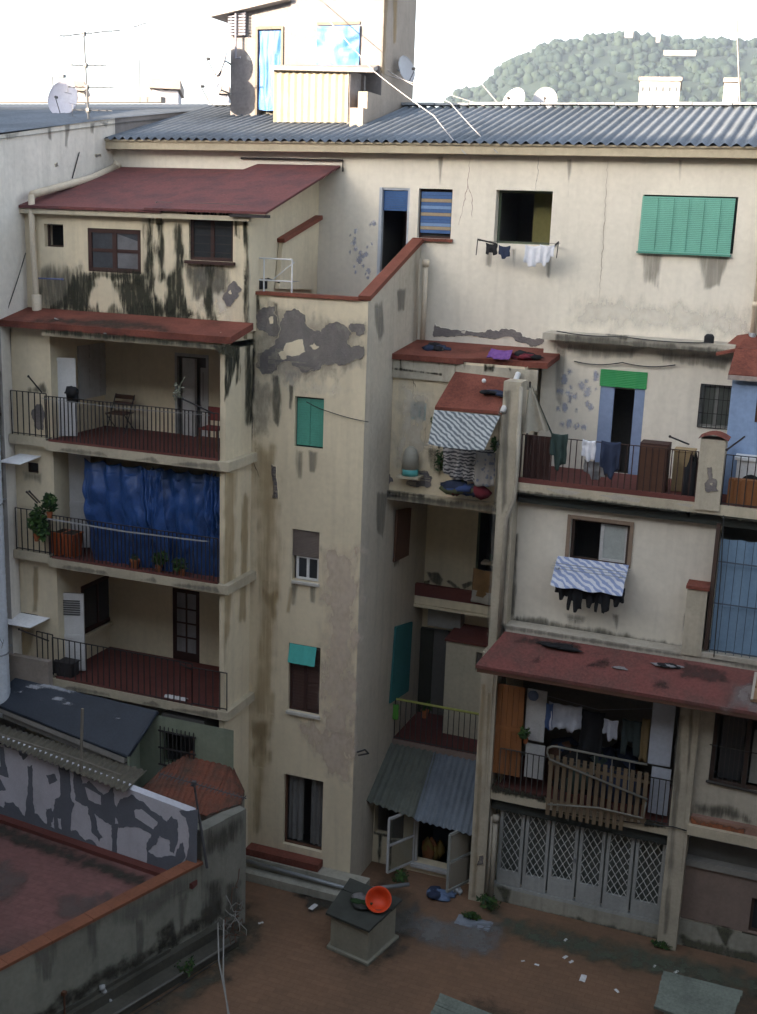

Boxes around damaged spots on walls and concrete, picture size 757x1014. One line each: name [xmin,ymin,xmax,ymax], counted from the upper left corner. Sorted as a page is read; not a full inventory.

peeling [222,281,242,307]
leakage [35,212,259,433]
peeling [256,306,366,375]
peeling [433,324,544,347]
leakage [273,376,293,424]
peeling [0,745,28,791]
leakage [0,825,145,885]
peeling [180,810,198,863]
leakage [698,806,747,821]
leakage [38,882,240,1014]